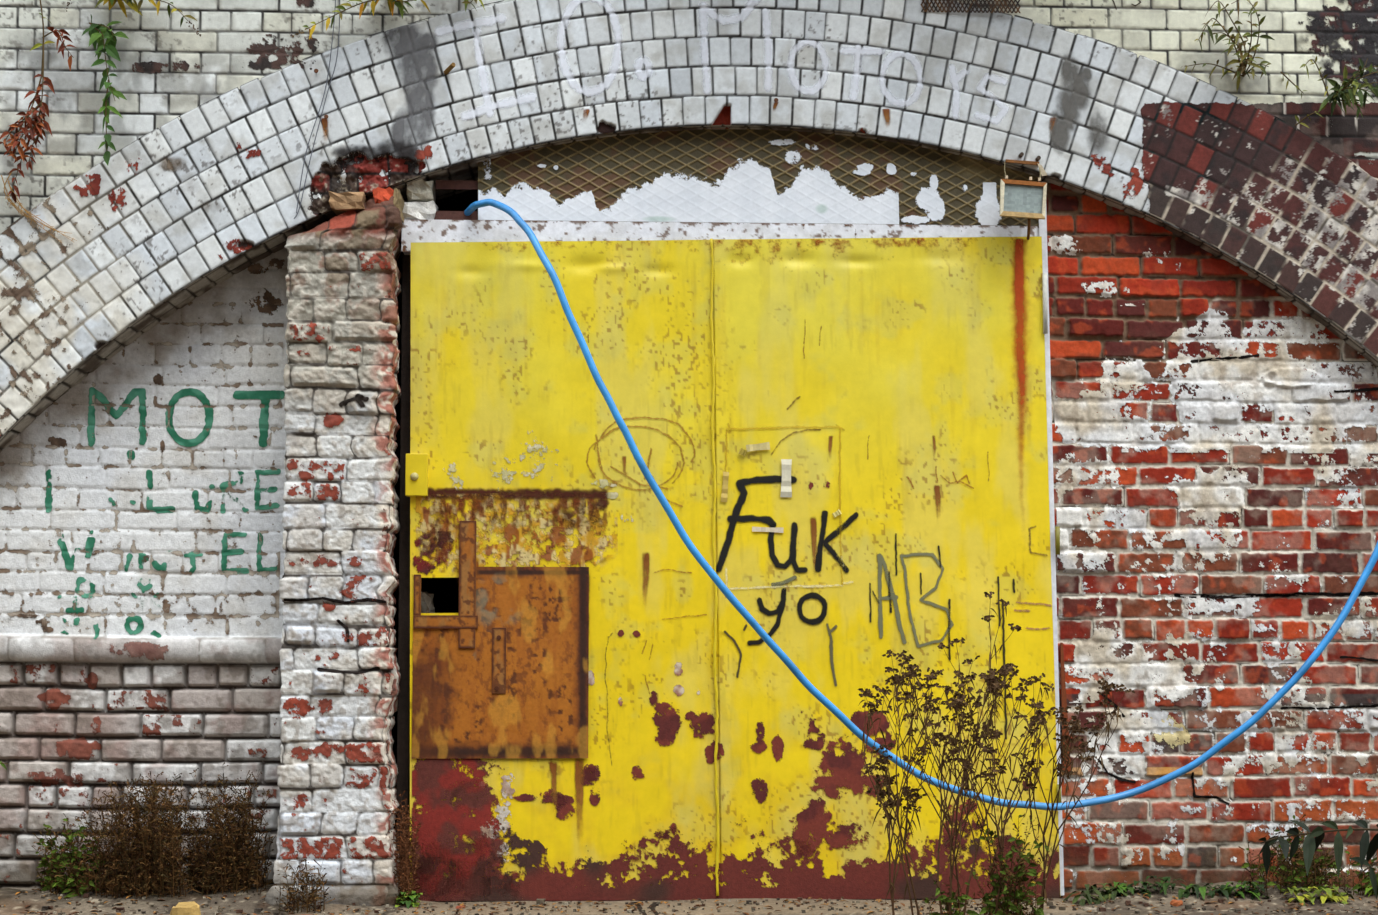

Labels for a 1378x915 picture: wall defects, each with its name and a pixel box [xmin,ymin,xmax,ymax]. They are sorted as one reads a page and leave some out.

spalling [308,145,433,215]
peeling [478,139,945,224]
rust [414,488,617,693]
peeling [0,173,1080,901]
rust [1013,239,1026,436]
peeling [1054,0,1378,870]